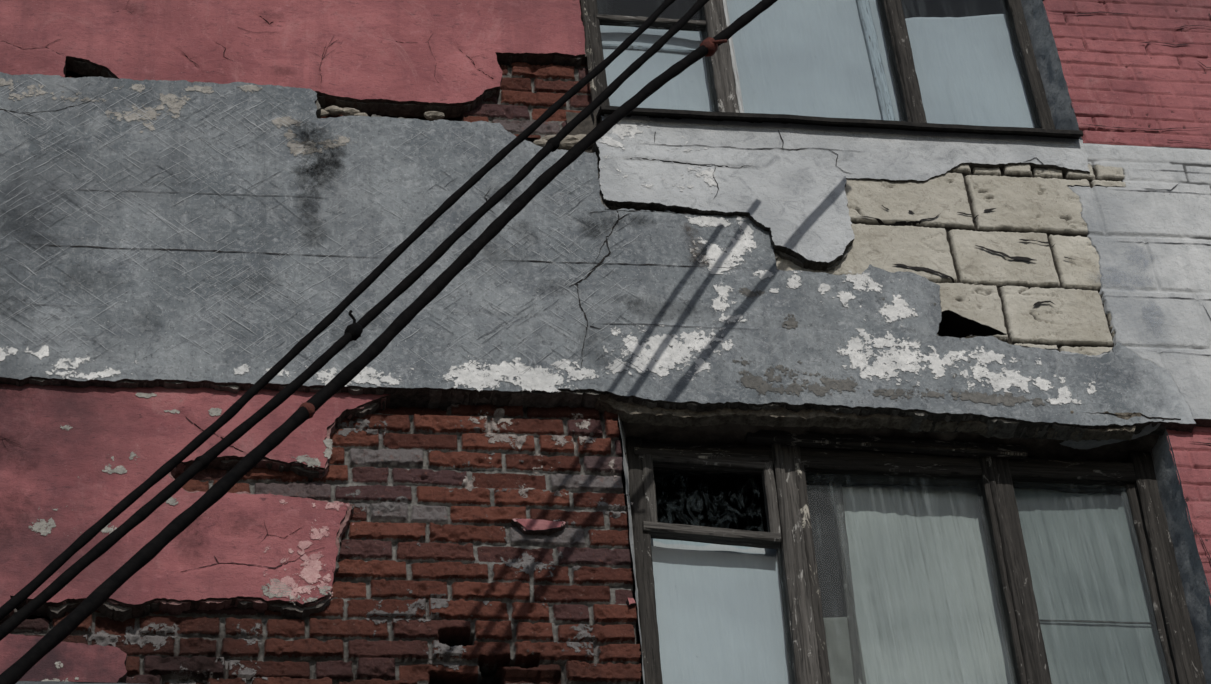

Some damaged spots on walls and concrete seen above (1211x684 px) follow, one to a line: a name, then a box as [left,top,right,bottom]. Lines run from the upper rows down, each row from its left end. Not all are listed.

peeling [272,116,359,156]
flaking render [315,51,651,178]
crack [508,130,860,368]
flaking render [0,162,1196,684]